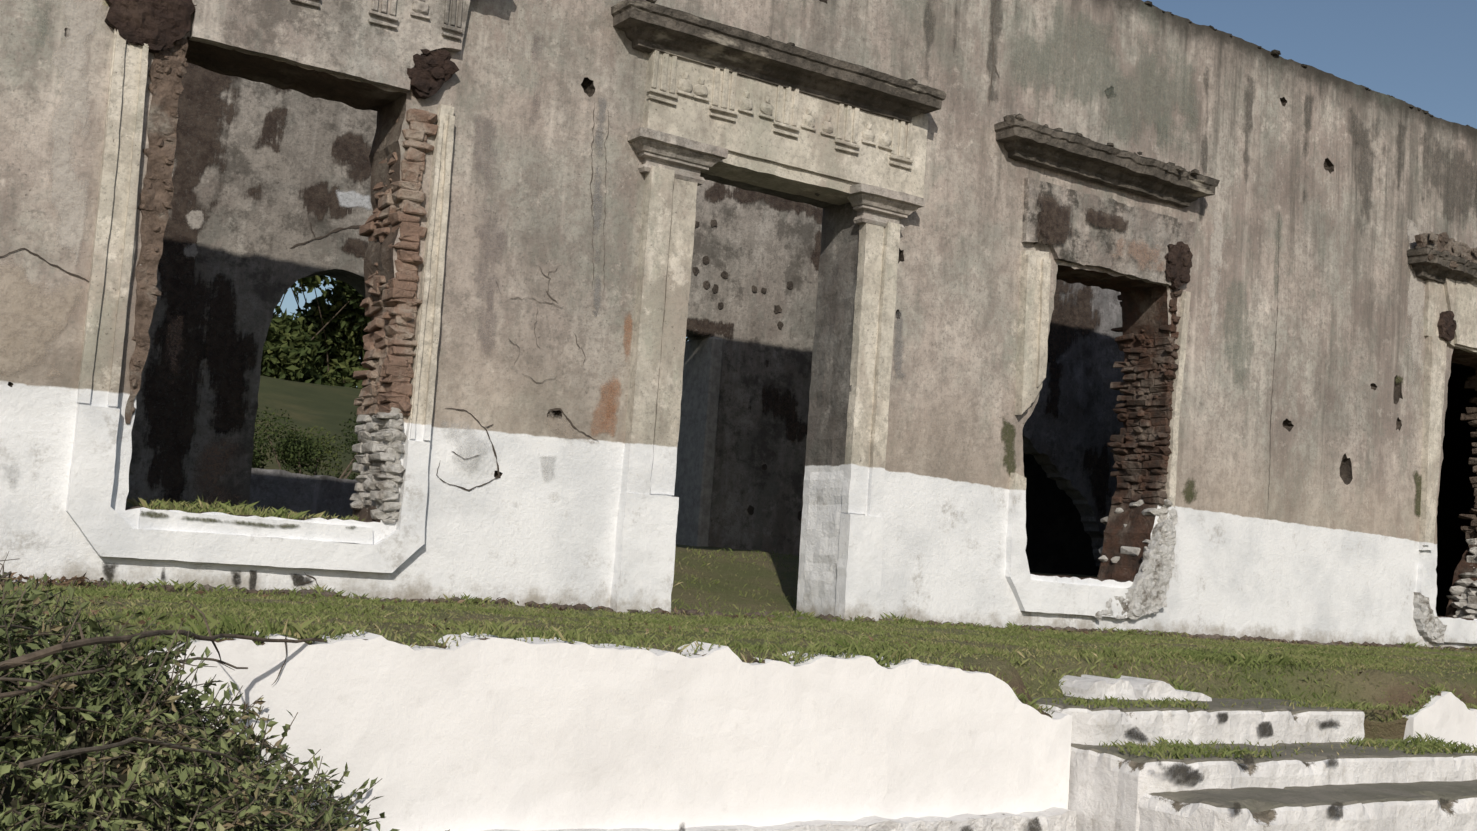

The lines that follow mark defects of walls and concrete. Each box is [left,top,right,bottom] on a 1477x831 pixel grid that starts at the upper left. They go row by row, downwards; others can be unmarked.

crack [0,248,89,282]
spalling [105,0,203,424]
damp [143,62,258,503]
damp [255,86,289,153]
damp [299,132,372,221]
spalling [337,49,459,524]
damp [1046,280,1101,418]
damp [1037,194,1129,245]
spalling [1437,311,1457,342]
crack [436,408,500,491]
spalling [1094,241,1193,621]
spalling [1413,375,1477,643]